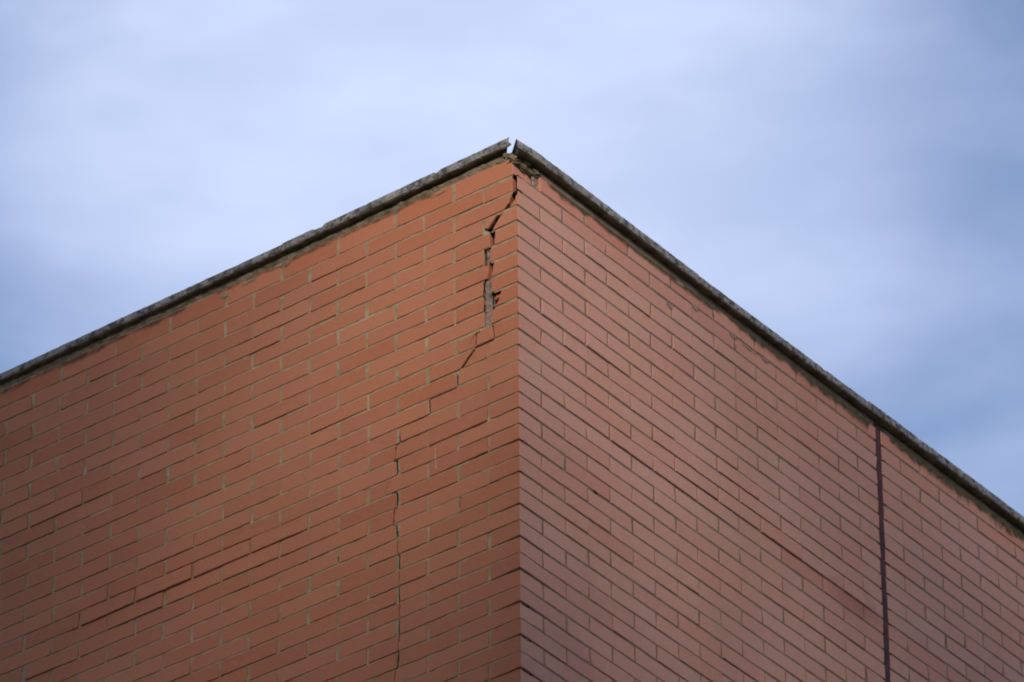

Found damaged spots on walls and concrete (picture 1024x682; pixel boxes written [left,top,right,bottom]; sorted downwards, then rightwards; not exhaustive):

crack [393,175,522,672]